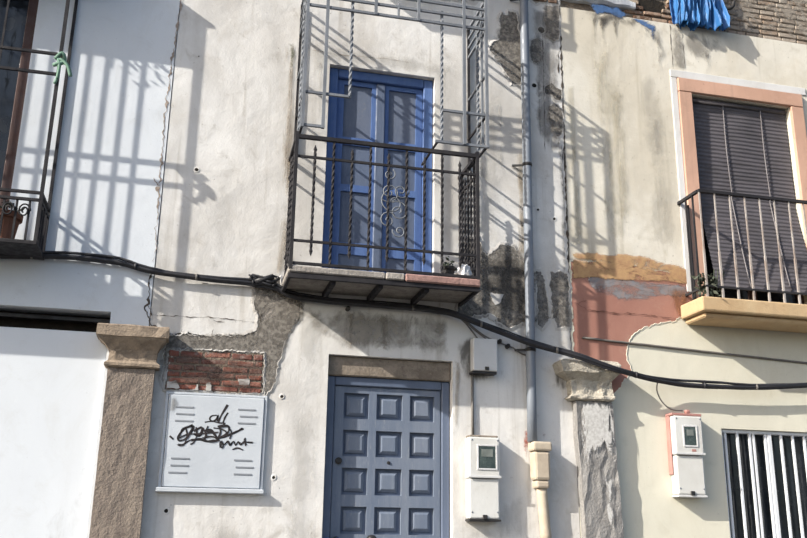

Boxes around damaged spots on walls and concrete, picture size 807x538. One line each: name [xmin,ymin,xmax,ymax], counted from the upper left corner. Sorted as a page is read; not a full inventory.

spalling [488,0,565,139]
damp [592,4,655,39]
crack [144,0,262,337]
spalling [158,275,305,400]
peeling [454,236,692,396]
peeling [582,403,614,462]
peeling [605,479,613,525]